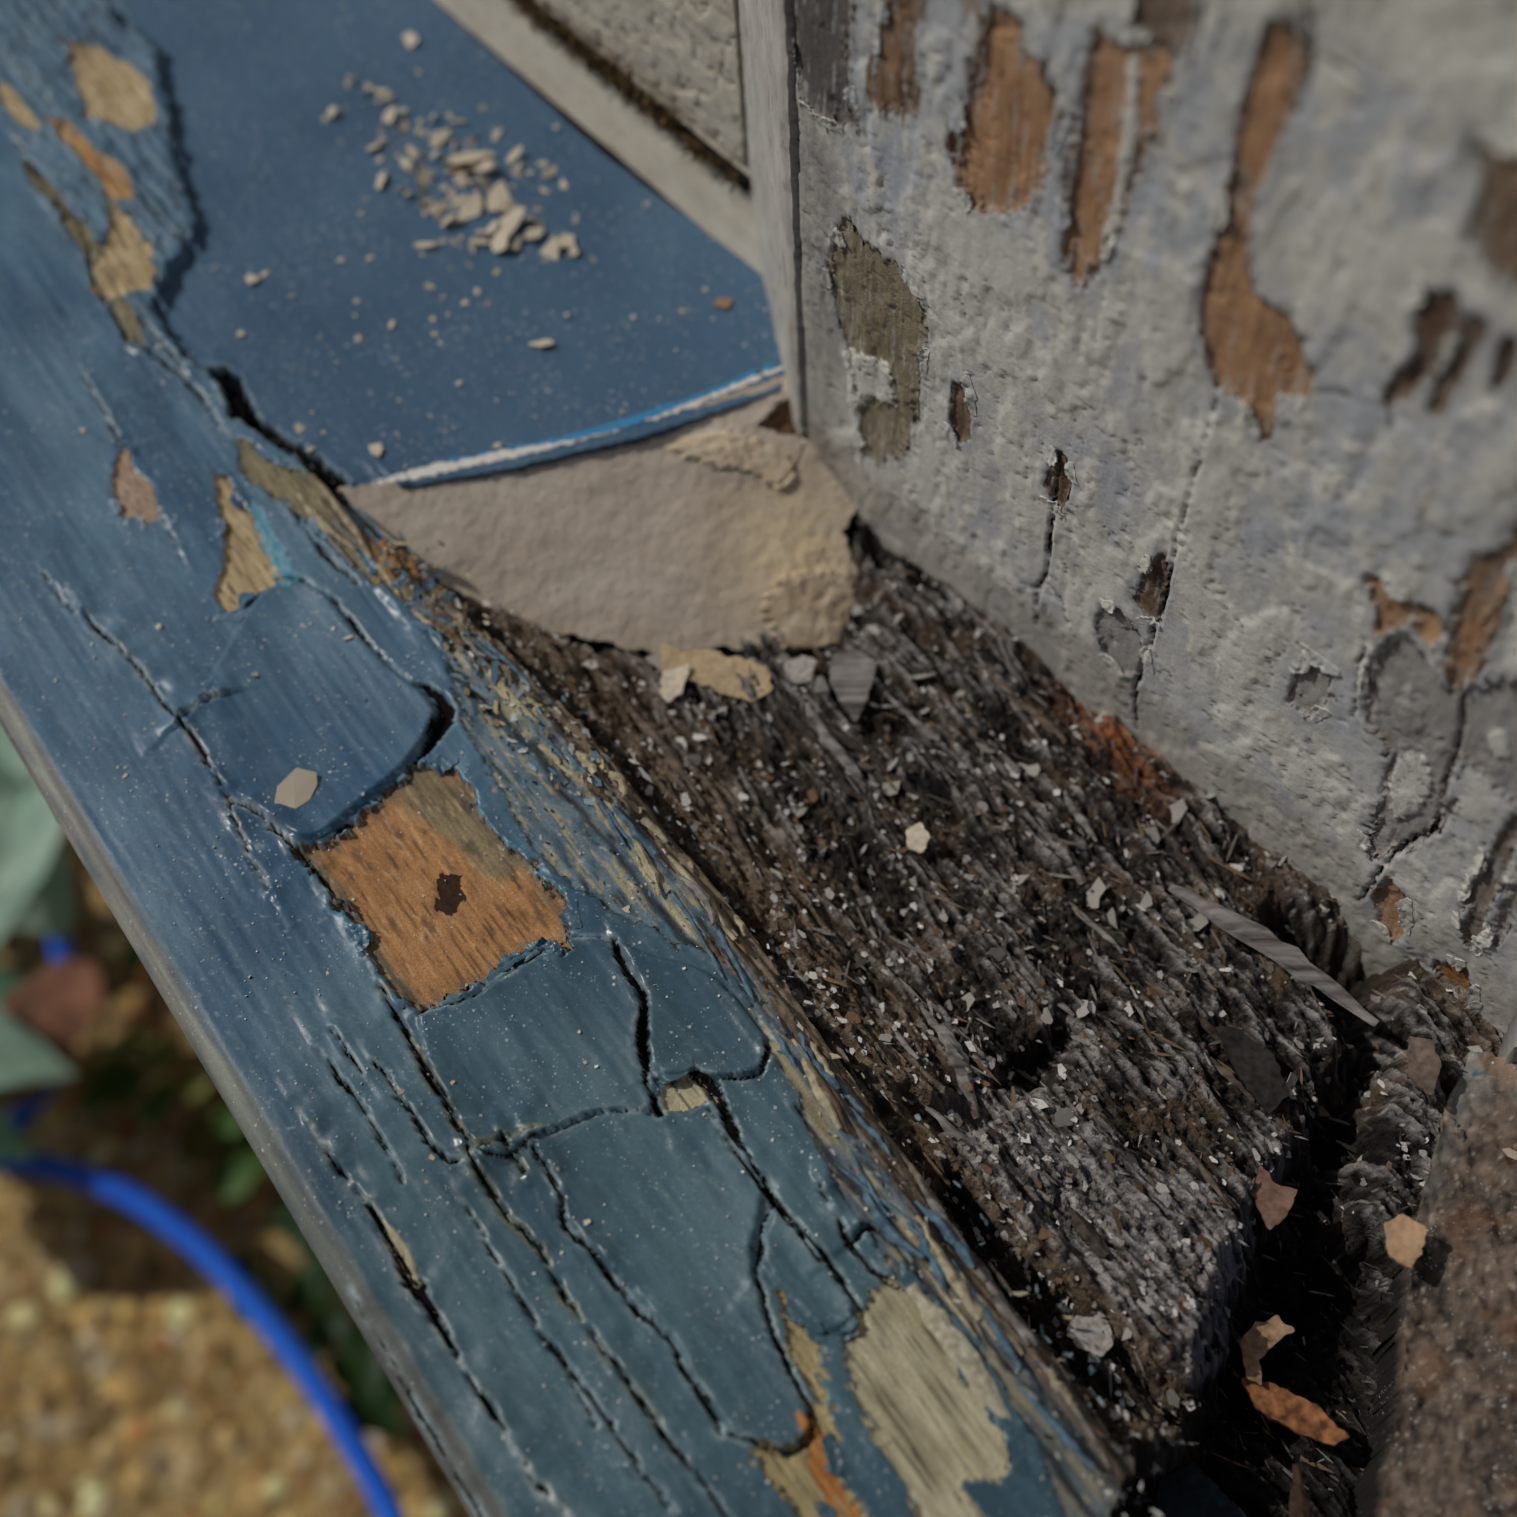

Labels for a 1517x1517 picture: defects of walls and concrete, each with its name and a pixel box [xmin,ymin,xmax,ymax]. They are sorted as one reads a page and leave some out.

peeling [792,0,926,135]
peeling [822,216,930,467]
peeling [945,0,1203,289]
peeling [1198,16,1314,444]
peeling [205,437,442,623]
peeling [289,754,582,1014]
crack [516,936,663,1118]
peeling [1085,877,1117,929]
peeling [1286,527,1517,1013]
crack [328,989,909,1517]
peeling [1384,1214,1427,1269]
peeling [752,1263,1028,1517]